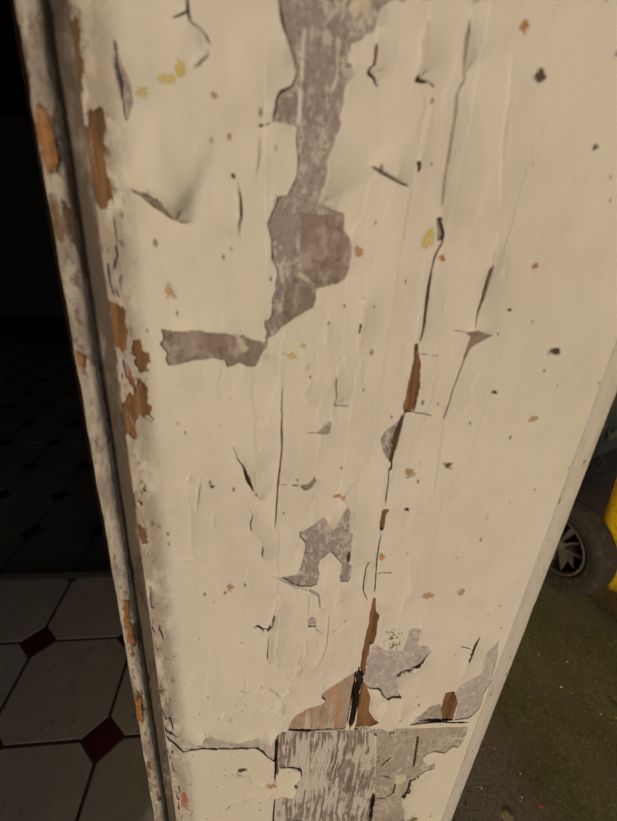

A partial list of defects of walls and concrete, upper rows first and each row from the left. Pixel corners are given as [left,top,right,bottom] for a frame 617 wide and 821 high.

peeling [160,0,449,370]
peeling [233,440,323,562]
peeling [255,480,380,669]
crack [272,1,521,821]
peeling [169,619,464,821]
peeling [410,637,498,725]